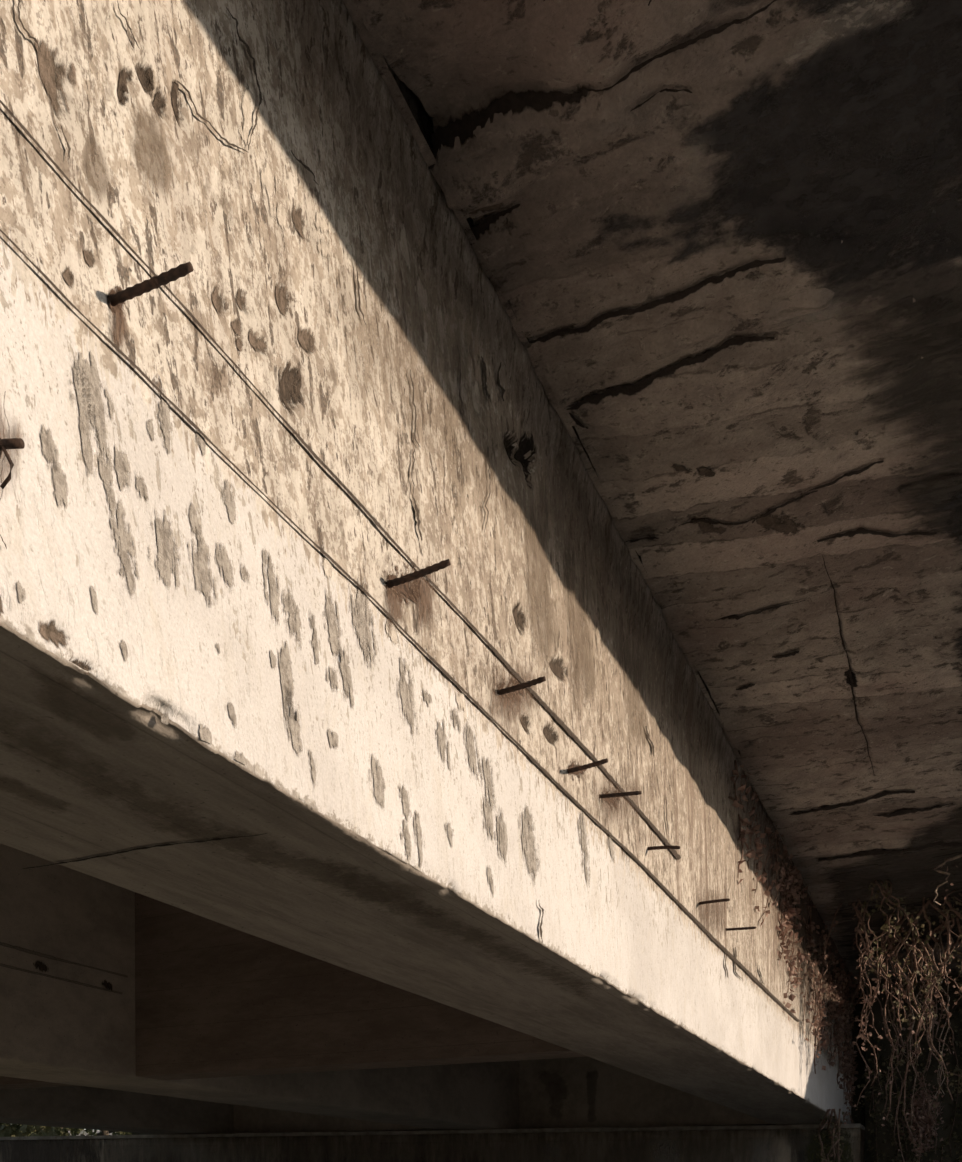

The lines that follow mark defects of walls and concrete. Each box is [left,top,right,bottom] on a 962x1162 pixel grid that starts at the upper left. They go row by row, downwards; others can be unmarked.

crack [177,7,262,152]
crack [428,0,777,170]
rust [109,294,128,346]
crack [527,257,786,343]
water stain [601,0,962,541]
crack [566,336,774,429]
rust [0,414,22,483]
spalling [504,430,535,489]
rust [491,671,533,722]
crack [789,527,953,818]
water stain [826,807,962,961]
water stain [0,1139,101,1162]